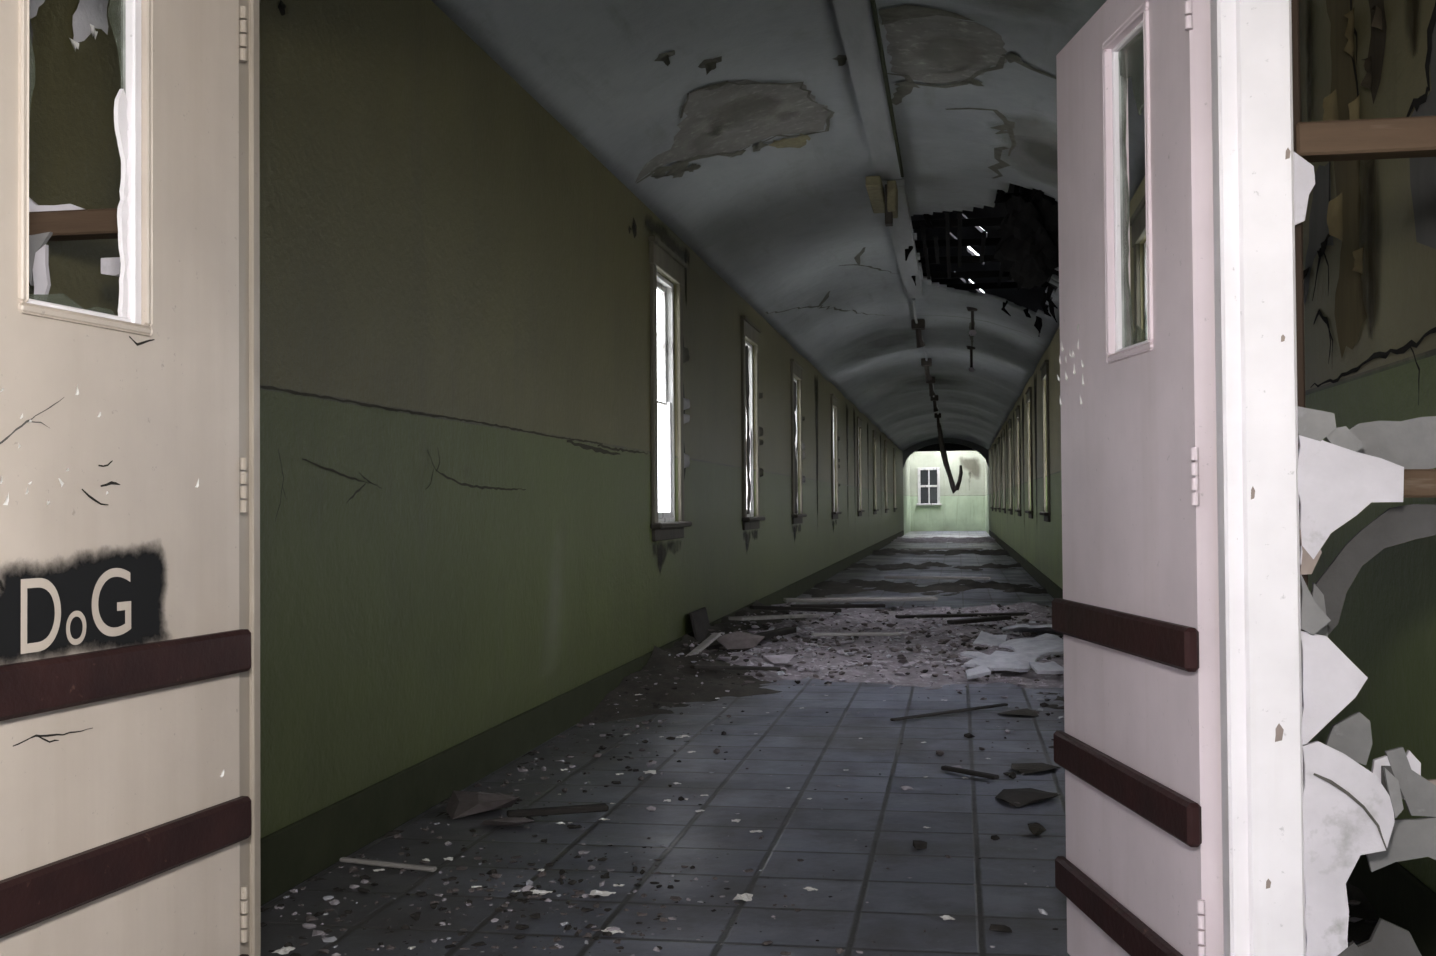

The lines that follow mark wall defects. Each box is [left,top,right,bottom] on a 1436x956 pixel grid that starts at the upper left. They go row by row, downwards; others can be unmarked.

peeling [879,4,1057,105]
peeling [635,56,835,183]
crack [1310,162,1436,405]
crack [0,397,64,444]
crack [275,449,381,521]
crack [260,385,648,491]